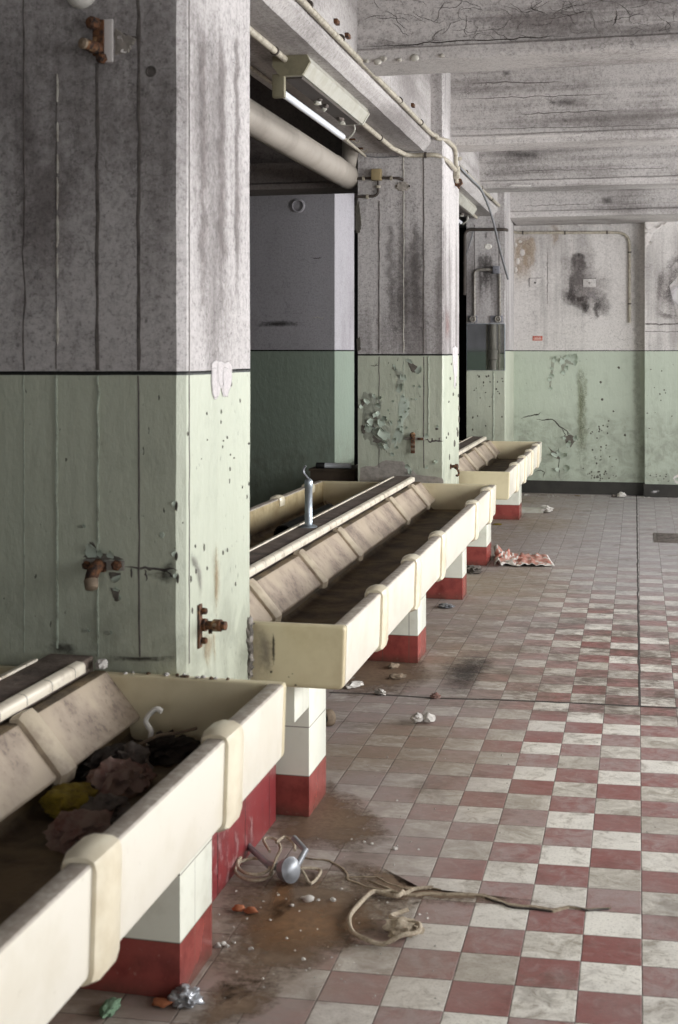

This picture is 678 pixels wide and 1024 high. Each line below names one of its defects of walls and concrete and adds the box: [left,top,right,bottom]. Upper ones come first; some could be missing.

crack [364,0,676,42]
leakage [568,255,601,316]
peeling [548,353,578,391]
peeling [359,359,486,483]
crack [523,412,569,478]
peeling [83,542,122,601]